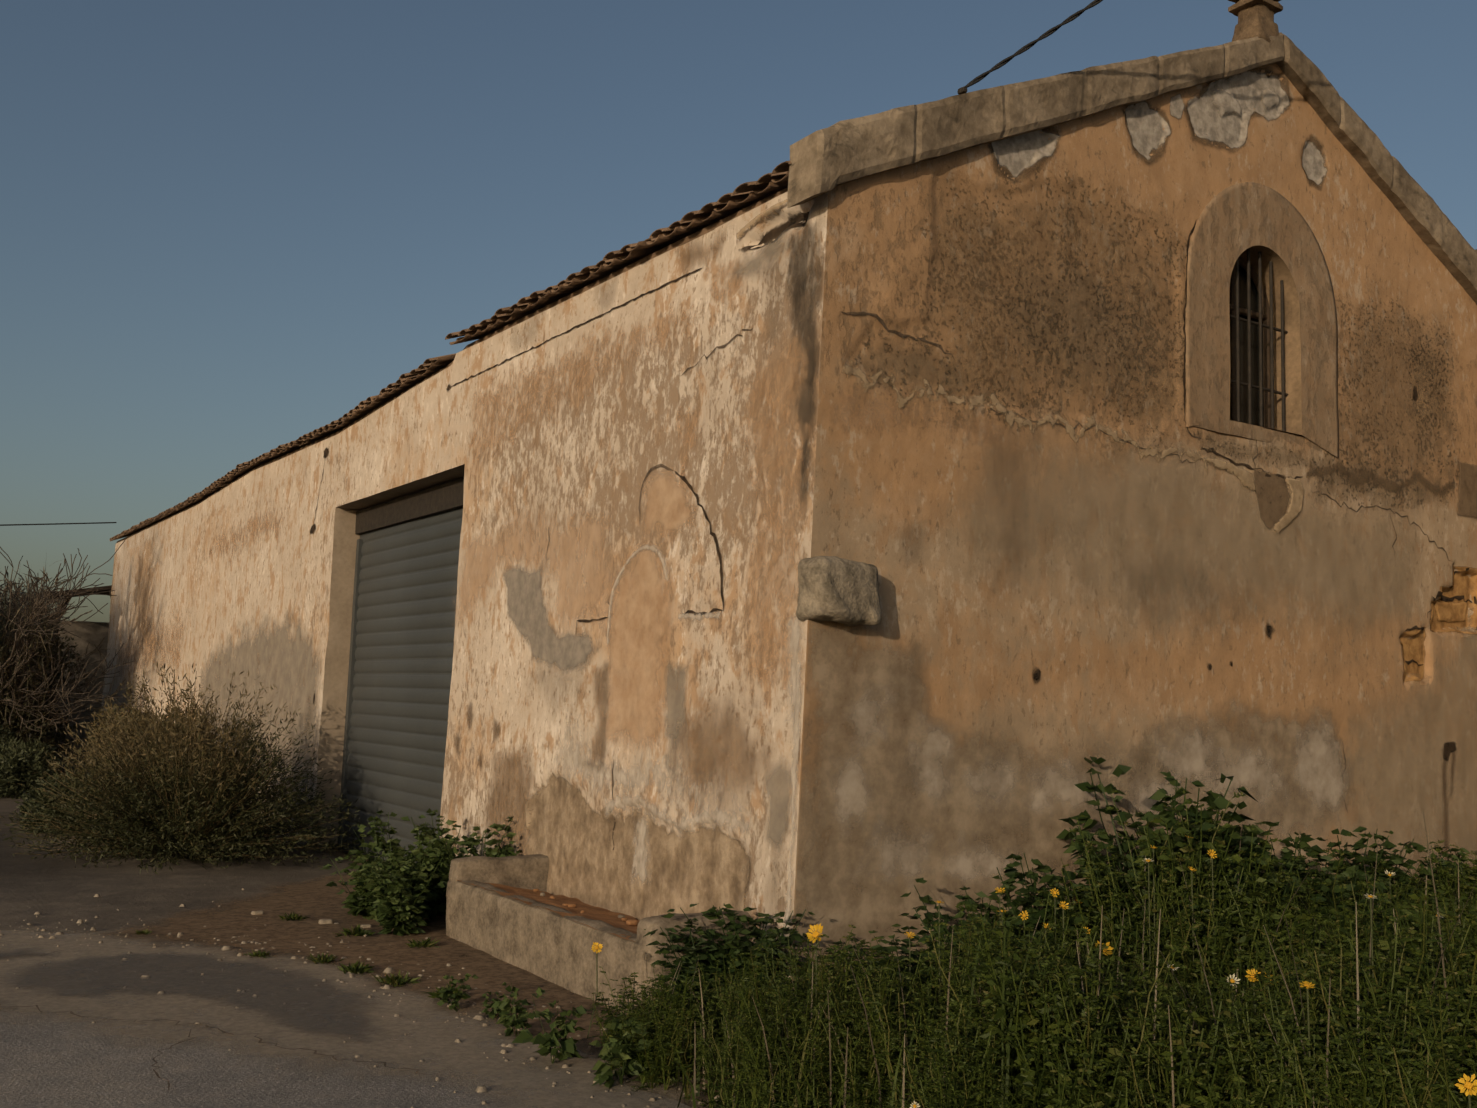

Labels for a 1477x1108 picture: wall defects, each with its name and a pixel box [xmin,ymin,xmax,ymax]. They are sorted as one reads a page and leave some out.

peeling [1123,68,1291,164]
leakage [788,224,821,496]
peeling [842,128,1461,533]
crack [1310,490,1450,561]
spalling [1399,565,1477,682]
leakage [789,617,1349,989]